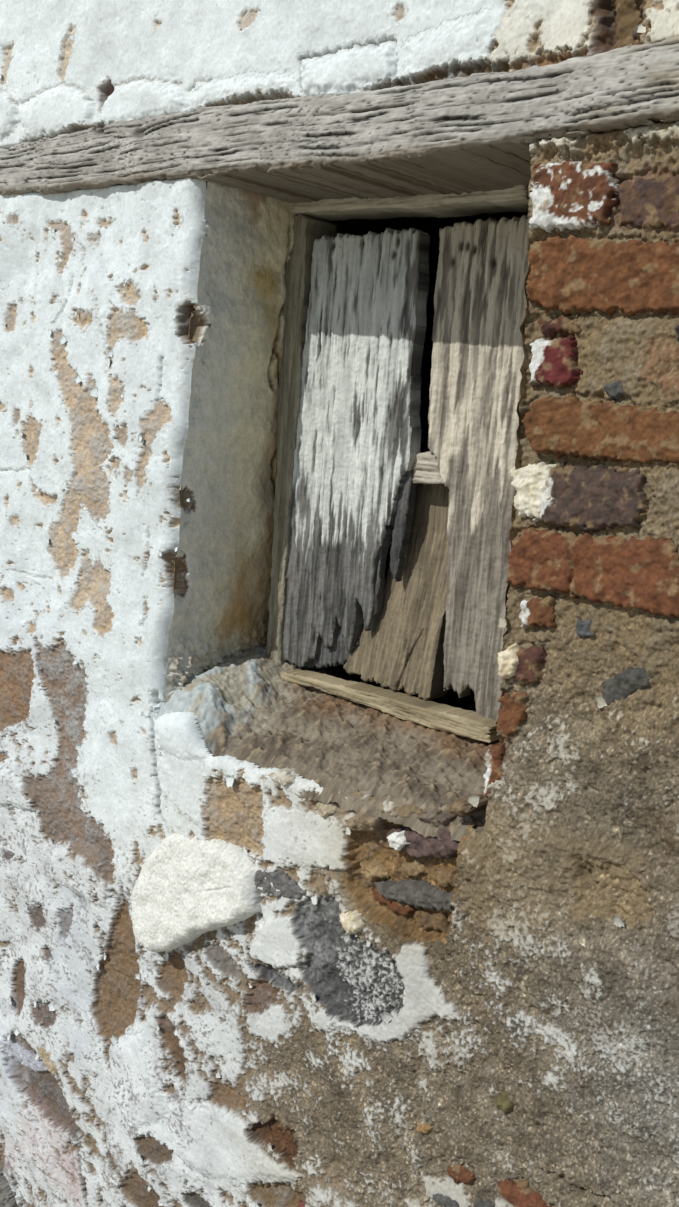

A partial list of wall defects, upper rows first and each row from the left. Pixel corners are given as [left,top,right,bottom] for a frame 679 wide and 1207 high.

spalling [359,45,593,92]
spalling [511,126,679,555]
peeling [0,277,175,640]
peeling [158,544,190,600]
peeling [0,620,115,872]
peeling [198,774,268,858]
spalling [497,582,679,770]
spalling [0,901,84,1154]
peeling [90,896,193,1083]
spalling [202,795,480,1030]
peeling [115,1131,175,1207]
spalling [245,1181,311,1207]